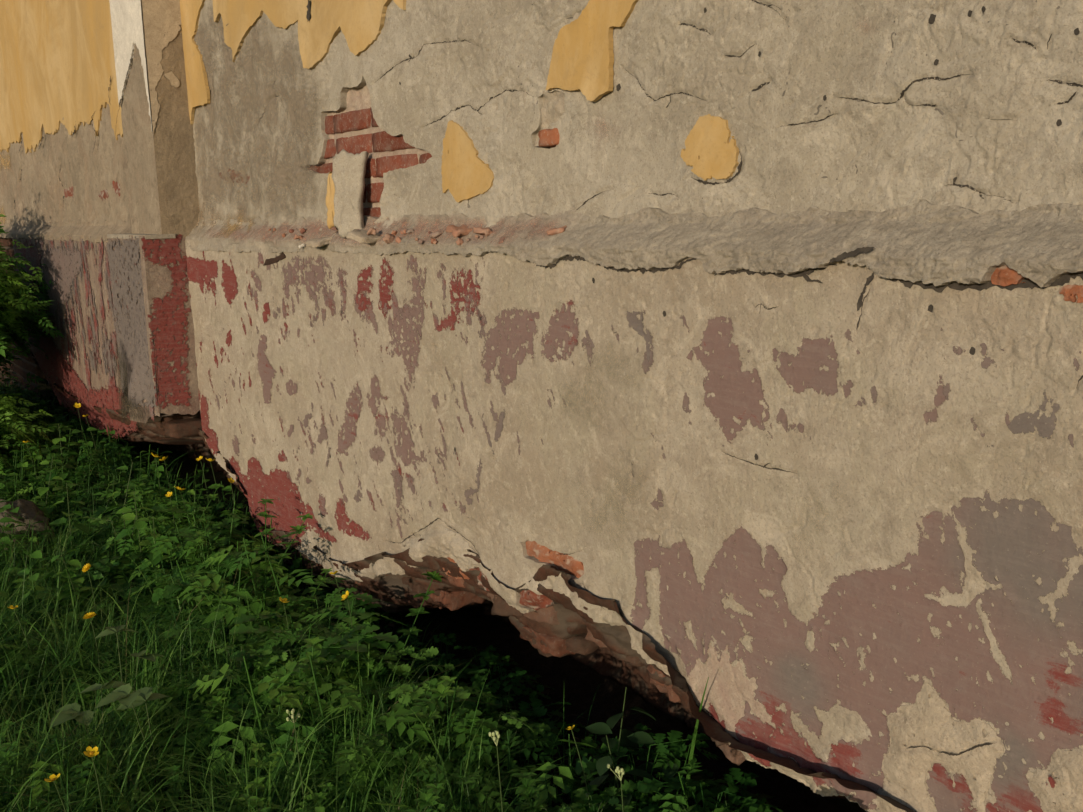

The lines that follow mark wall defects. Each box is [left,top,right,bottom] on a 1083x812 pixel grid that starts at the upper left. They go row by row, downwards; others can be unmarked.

crack [735,0,819,28]
crack [988,0,1060,50]
crack [357,39,479,82]
crack [426,65,538,126]
crack [752,15,1013,203]
crack [1047,80,1083,105]
crack [577,151,742,210]
flaking render [0,0,1083,547]
crack [528,247,1083,329]
crack [724,452,793,473]
peeling [630,491,1083,812]
crack [907,742,997,756]